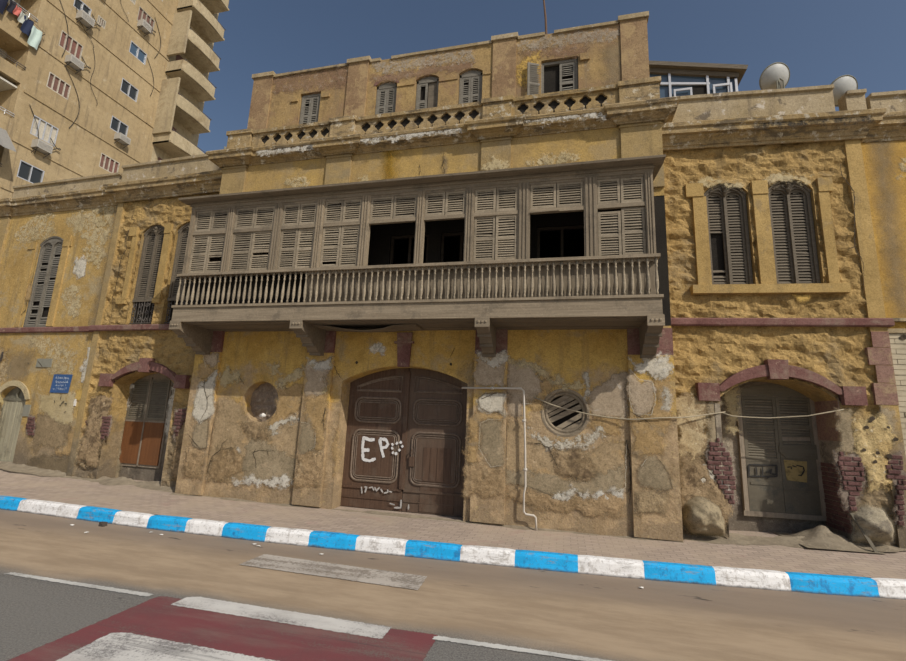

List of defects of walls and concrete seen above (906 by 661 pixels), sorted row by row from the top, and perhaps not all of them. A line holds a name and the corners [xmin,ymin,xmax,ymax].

flaking render [164,353,333,488]